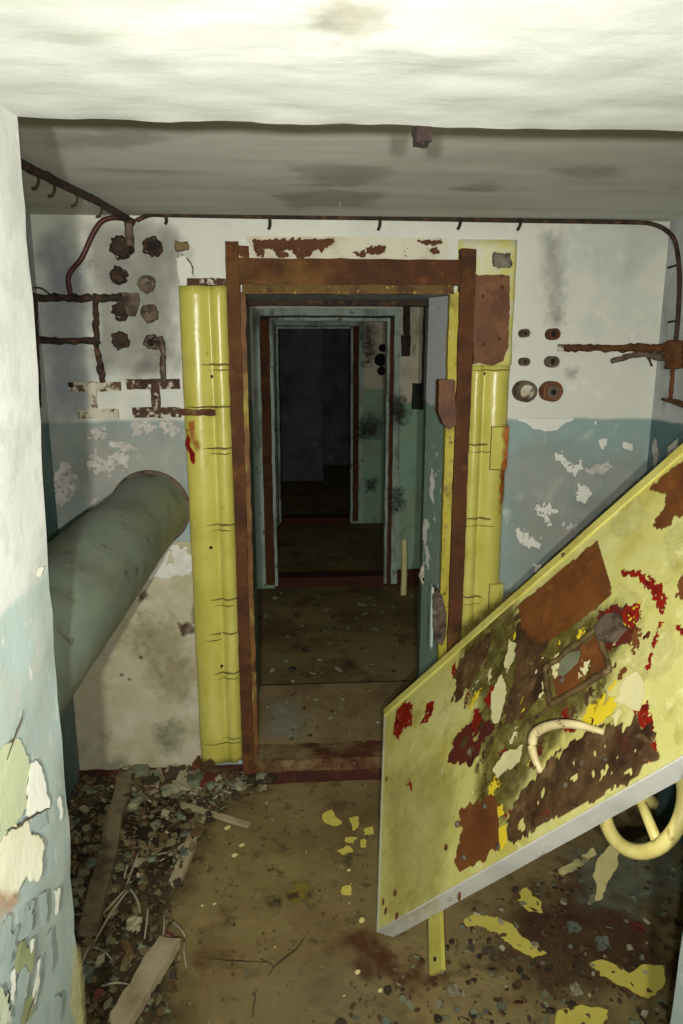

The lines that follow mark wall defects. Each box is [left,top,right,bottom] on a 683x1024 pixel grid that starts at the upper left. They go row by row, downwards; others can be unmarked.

peeling [54,420,181,507]
peeling [517,417,574,431]
peeling [554,438,612,504]
peeling [516,502,584,549]
flaking render [73,541,220,775]
peeling [0,738,63,1024]